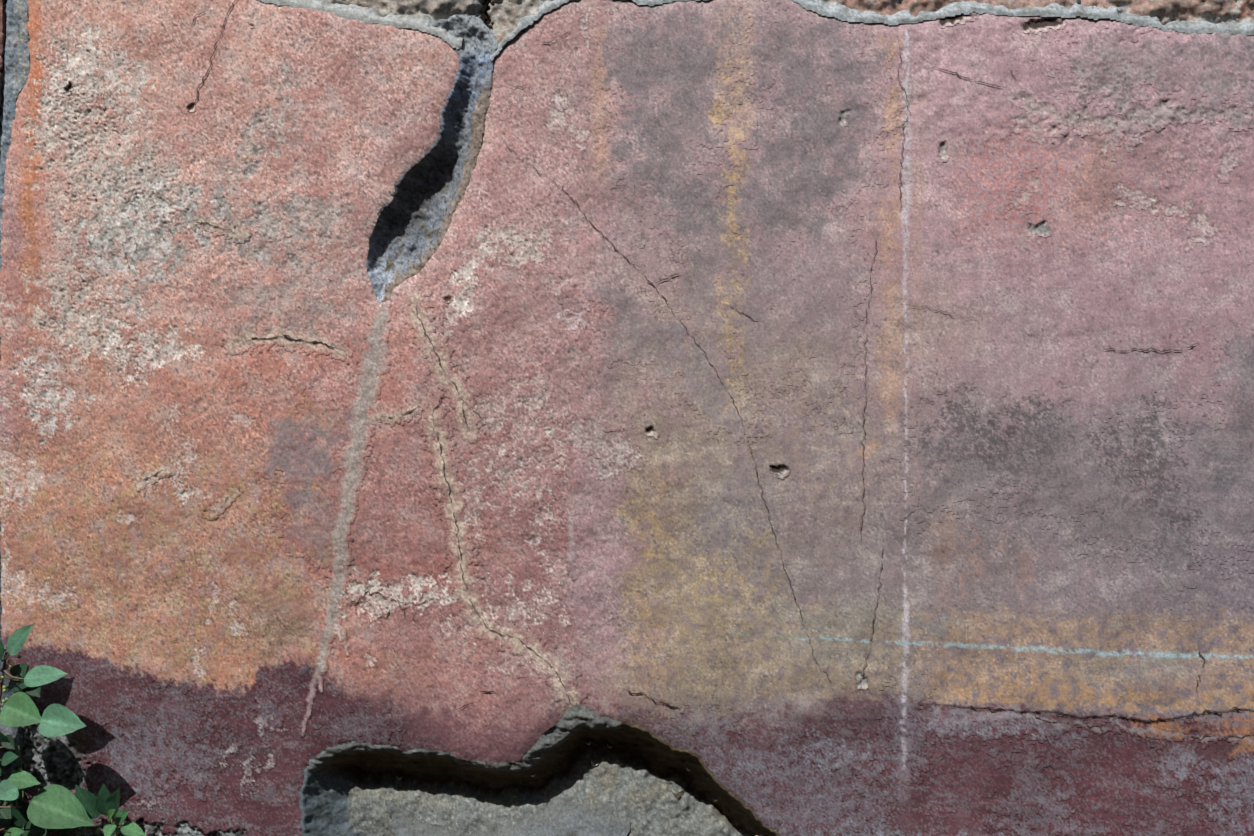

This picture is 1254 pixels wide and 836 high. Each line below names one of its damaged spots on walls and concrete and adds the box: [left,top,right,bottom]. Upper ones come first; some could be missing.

crack [191,0,236,107]
peeling [0,0,497,804]
crack [502,139,883,684]
crack [220,285,587,737]
peeling [452,357,653,645]
spalling [54,799,247,836]
water stain [79,675,288,824]
water stain [314,700,406,747]
peeling [335,565,550,684]
spalling [299,705,779,836]
water stain [648,665,1254,836]
crack [932,651,1254,747]